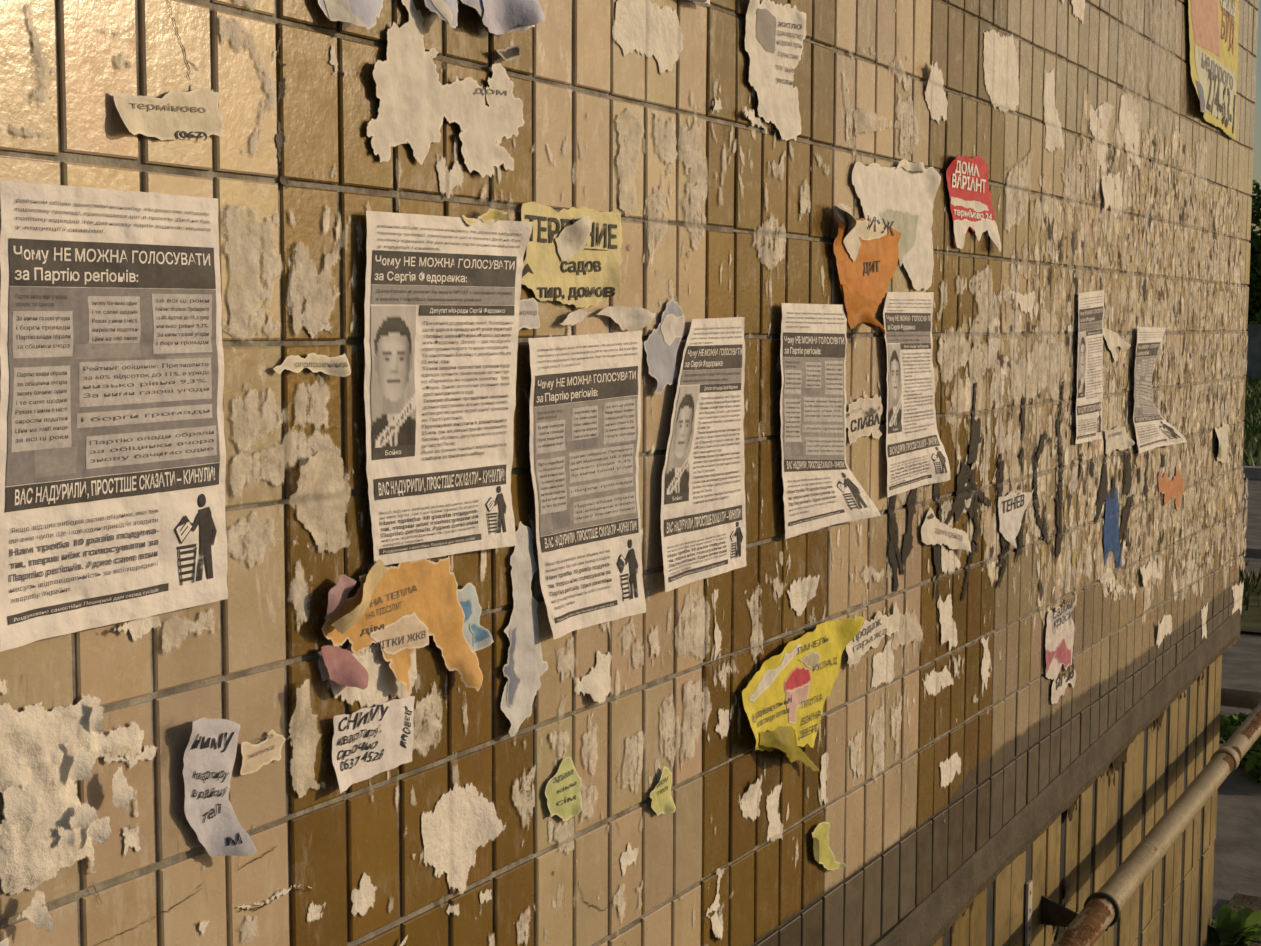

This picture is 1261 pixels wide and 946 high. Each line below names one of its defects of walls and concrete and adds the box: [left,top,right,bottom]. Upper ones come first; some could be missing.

corrosion [1222,711,1261,771]
corrosion [1058,899,1111,946]